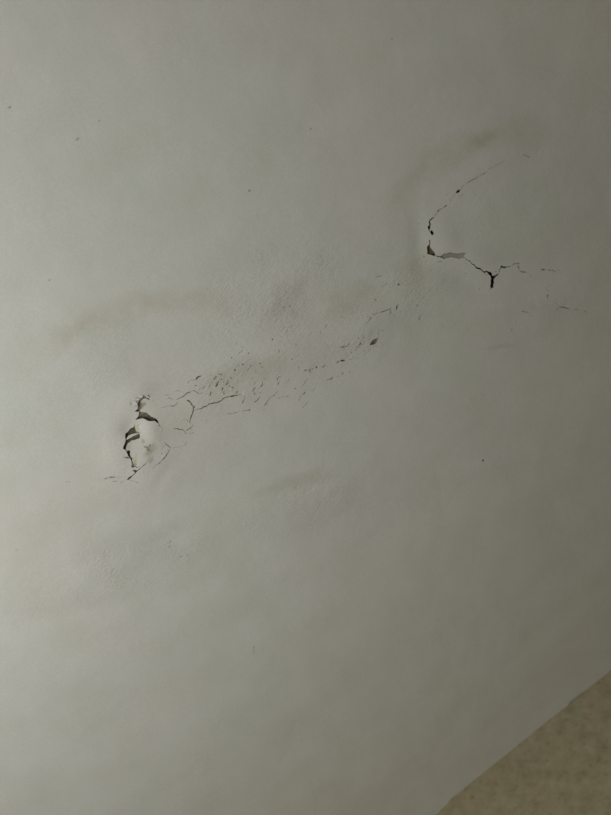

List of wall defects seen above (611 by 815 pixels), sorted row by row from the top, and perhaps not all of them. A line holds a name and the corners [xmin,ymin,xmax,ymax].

crack [427,172,555,289]
peeling [123,395,160,480]
crack [158,337,364,464]